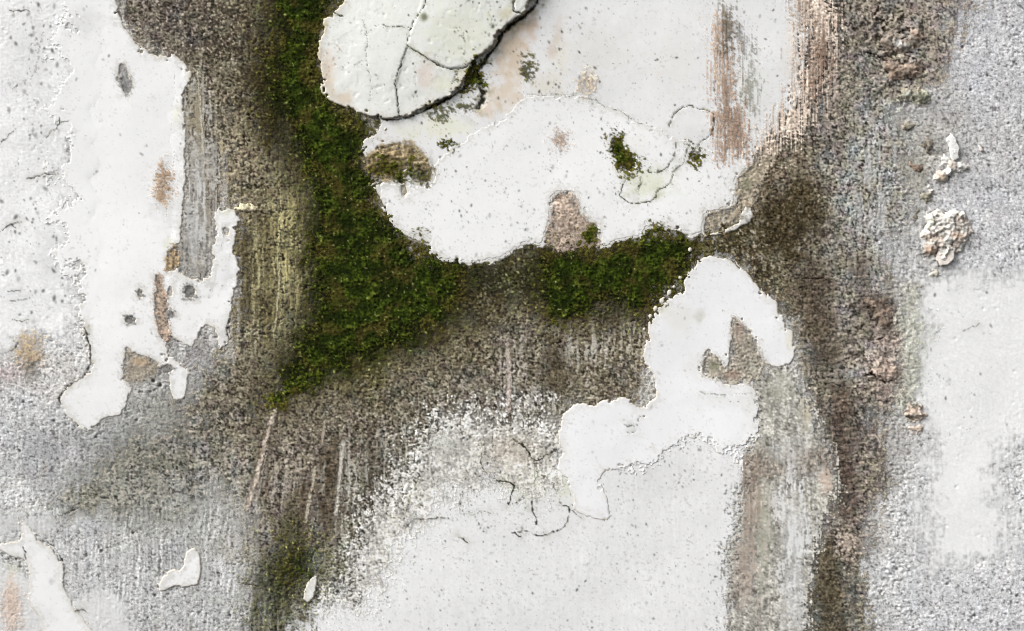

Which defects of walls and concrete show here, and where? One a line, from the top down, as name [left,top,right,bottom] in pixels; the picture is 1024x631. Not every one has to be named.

peeling [0,502,139,631]
peeling [0,0,257,431]
peeling [157,547,201,591]
damp [39,0,668,631]
crack [376,0,538,121]
crack [393,439,577,543]
peeling [285,0,848,631]
damp [664,0,986,631]
spalling [880,28,931,106]
peeling [863,133,1024,581]